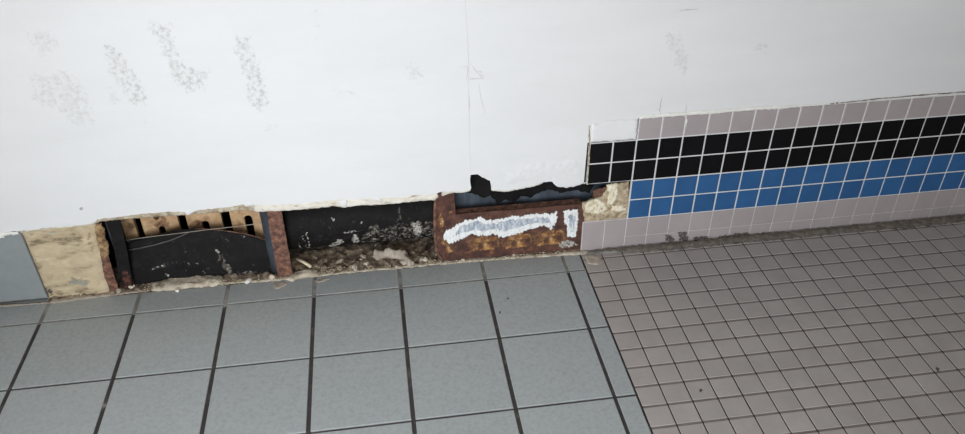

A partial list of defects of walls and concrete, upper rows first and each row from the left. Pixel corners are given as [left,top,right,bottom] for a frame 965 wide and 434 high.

flaking render [492,173,582,192]
peeling [581,181,630,221]
peeling [0,190,470,299]
rust [473,230,564,250]